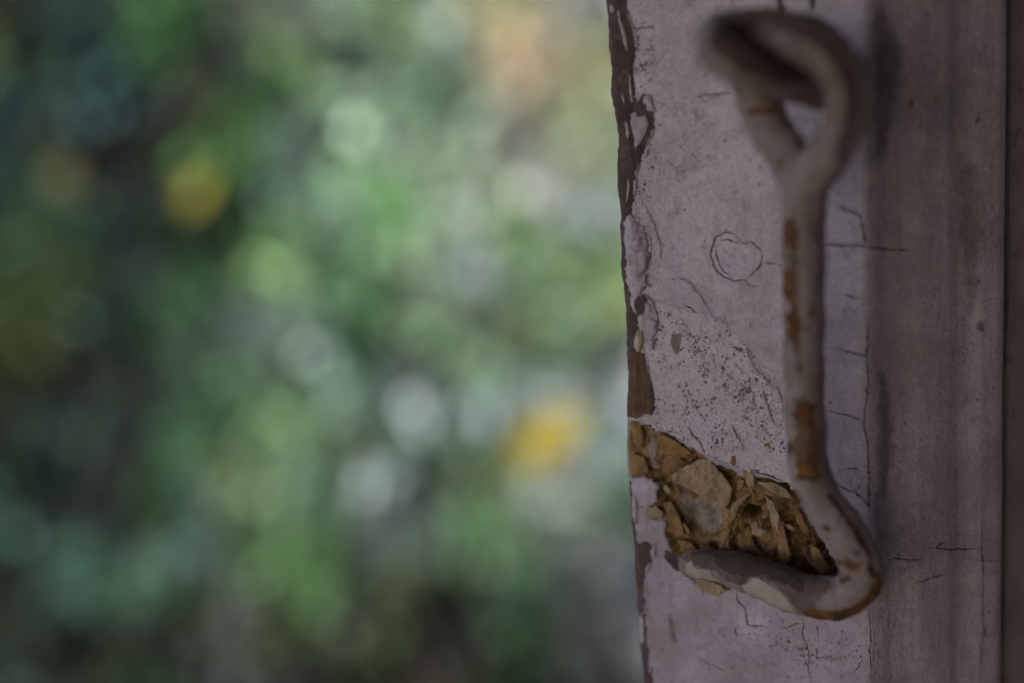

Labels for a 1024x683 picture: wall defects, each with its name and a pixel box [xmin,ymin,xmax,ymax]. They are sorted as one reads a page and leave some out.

crack [645,204,784,425]
spalling [606,0,839,683]
corrosion [782,218,802,371]
crack [825,205,909,252]
corrosion [787,398,819,481]
corrosion [804,493,882,621]